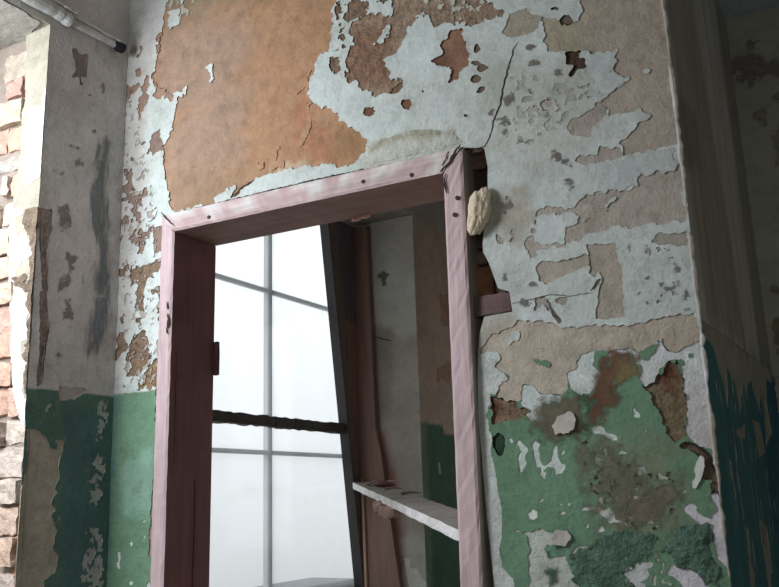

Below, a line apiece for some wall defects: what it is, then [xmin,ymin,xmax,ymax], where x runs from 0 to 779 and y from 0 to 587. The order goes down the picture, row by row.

crack [463,44,517,150]
peeling [0,0,66,587]
damp [58,204,71,227]
damp [58,252,78,291]
damp [87,139,110,354]
crack [148,163,389,222]
spalling [115,0,690,396]
crack [512,279,601,322]
rust [528,350,641,442]
rust [642,360,687,442]
peeling [88,454,106,506]
peeling [80,527,104,587]